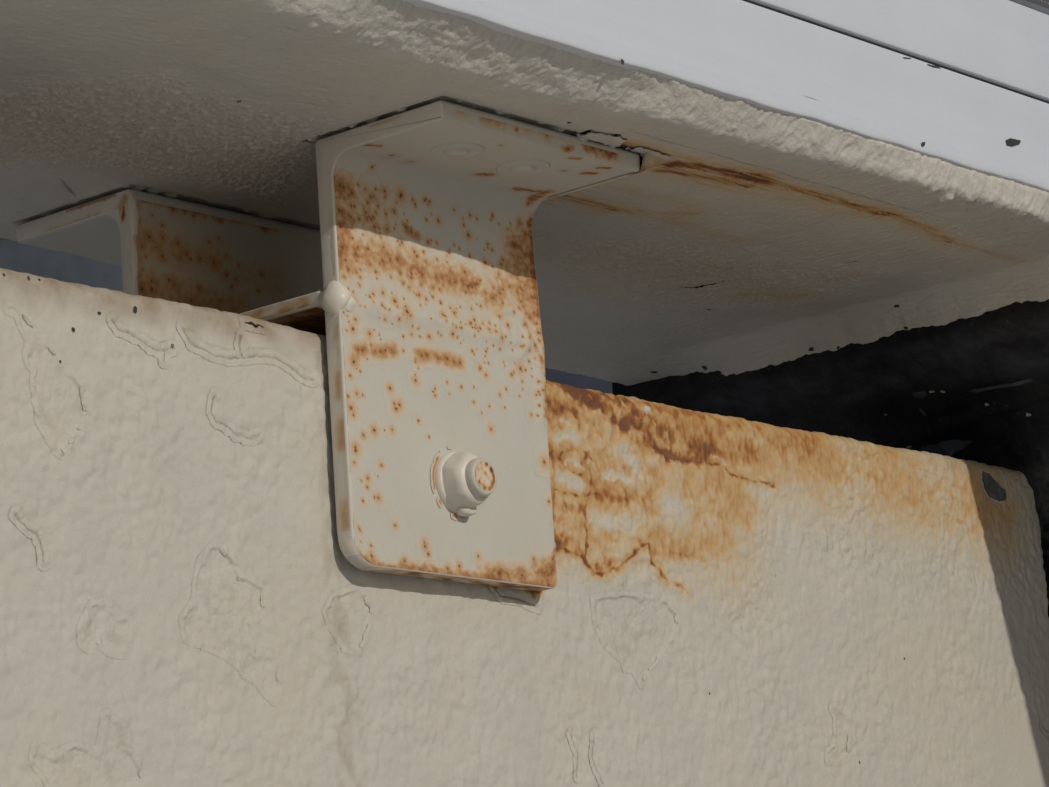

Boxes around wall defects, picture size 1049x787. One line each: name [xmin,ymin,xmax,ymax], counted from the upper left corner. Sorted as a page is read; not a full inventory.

crack [106,312,320,446]
rust [43,107,1049,633]
spalling [981,470,1006,504]